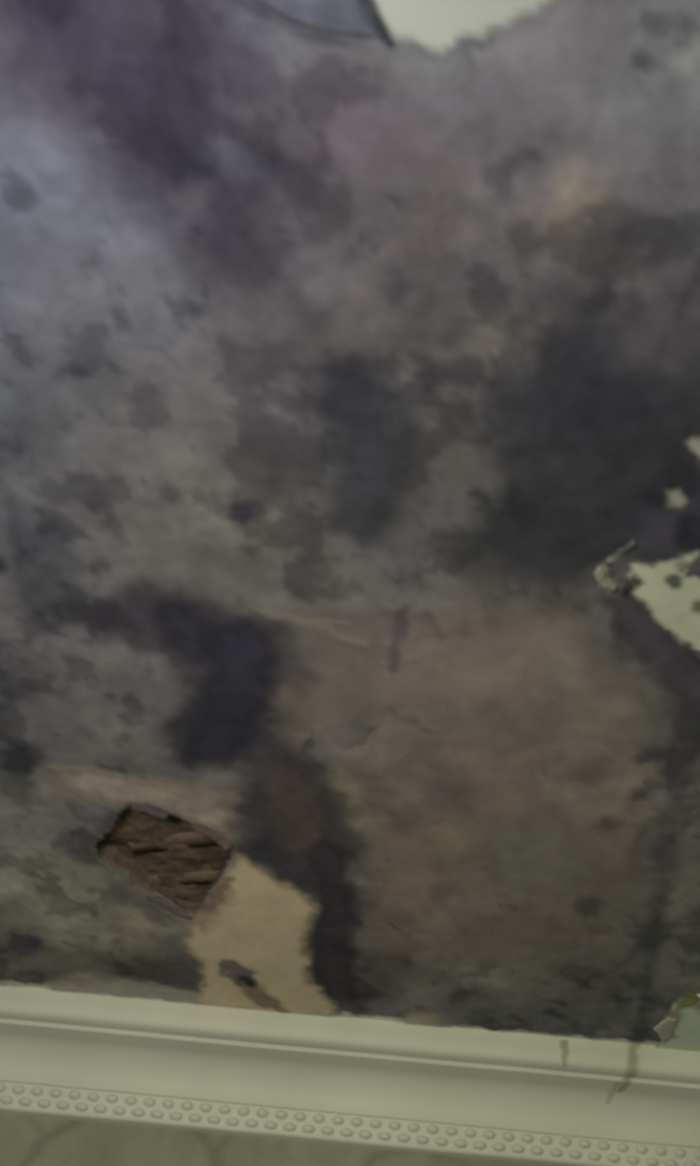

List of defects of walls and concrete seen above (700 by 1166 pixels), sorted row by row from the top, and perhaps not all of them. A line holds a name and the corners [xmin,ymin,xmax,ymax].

water stain [509,344,700,574]
peeling [669,491,686,507]
peeling [688,438,700,457]
peeling [594,541,700,661]
water stain [107,587,357,1006]
water stain [415,632,645,857]
water stain [607,597,700,775]
peeling [62,768,335,1017]
water stain [442,844,597,956]
water stain [50,972,205,1005]
water stain [405,1012,449,1027]
peeling [653,993,700,1052]